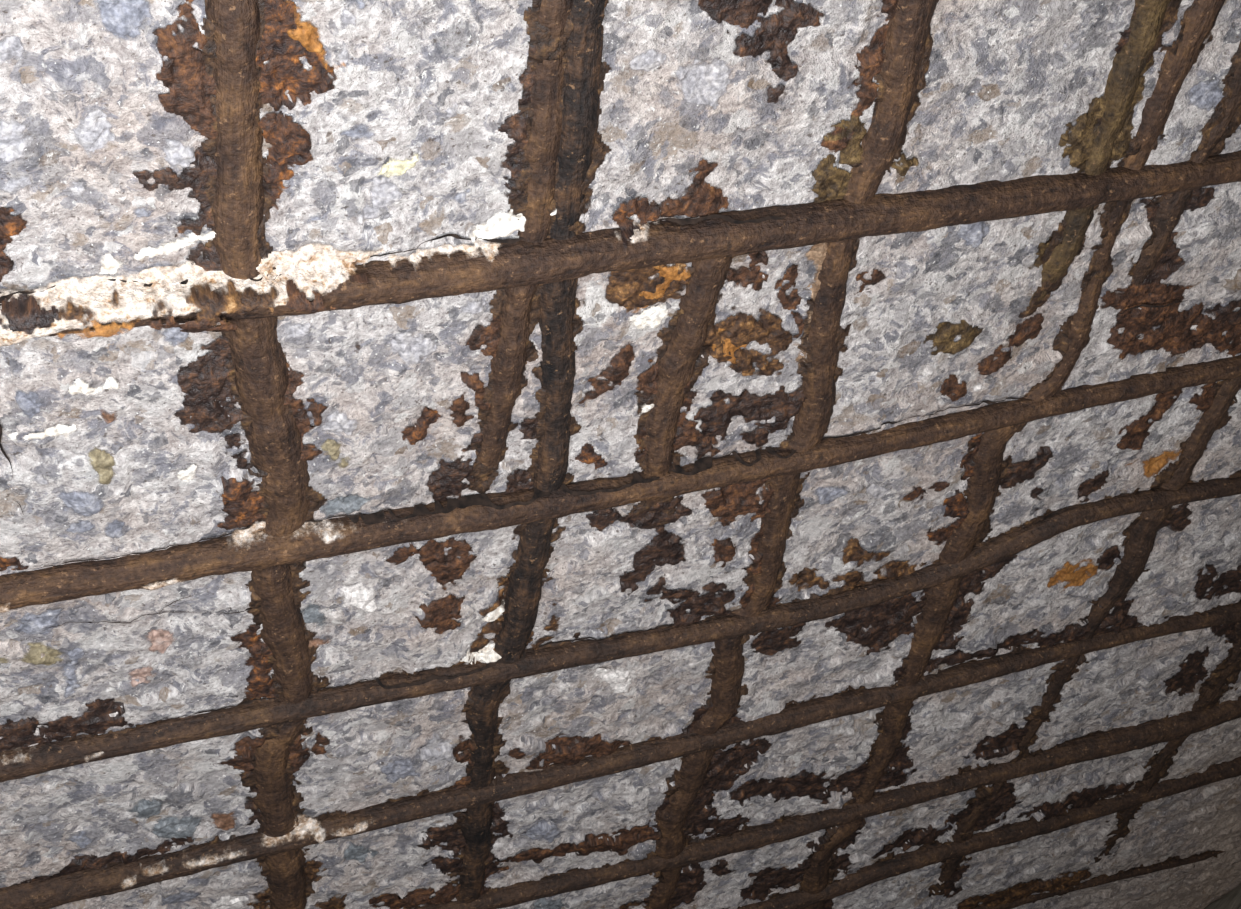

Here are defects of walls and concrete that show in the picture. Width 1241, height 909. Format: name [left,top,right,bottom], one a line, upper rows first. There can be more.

corrosion [698,0,824,104]
corrosion [132,0,345,534]
corrosion [401,284,547,502]
damp [469,209,526,243]
corrosion [669,243,828,472]
corrosion [977,194,1241,393]
spalling [0,571,256,738]
spalling [0,729,263,888]
spalling [293,687,472,818]
spalling [299,525,521,687]
spalling [495,642,715,777]
spalling [418,655,1241,909]